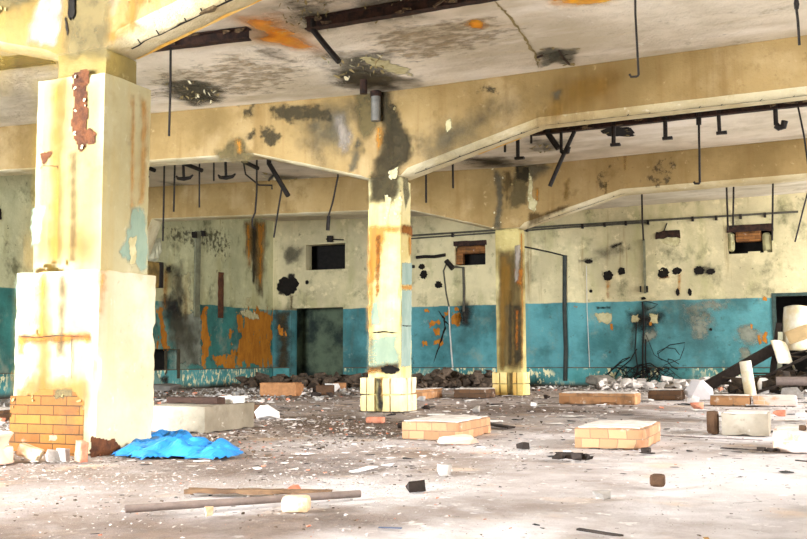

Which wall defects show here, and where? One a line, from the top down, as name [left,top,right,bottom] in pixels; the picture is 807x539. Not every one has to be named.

water stain [29,0,112,56]
corrosion [136,0,262,59]
corrosion [223,19,312,49]
crack [494,1,539,68]
spalling [71,69,96,152]
flaking render [151,58,293,105]
water stain [270,56,413,202]
water stain [164,266,193,317]
corrosion [368,225,412,327]
corrosion [18,334,90,354]
peeling [156,297,287,369]
peeling [422,307,461,347]